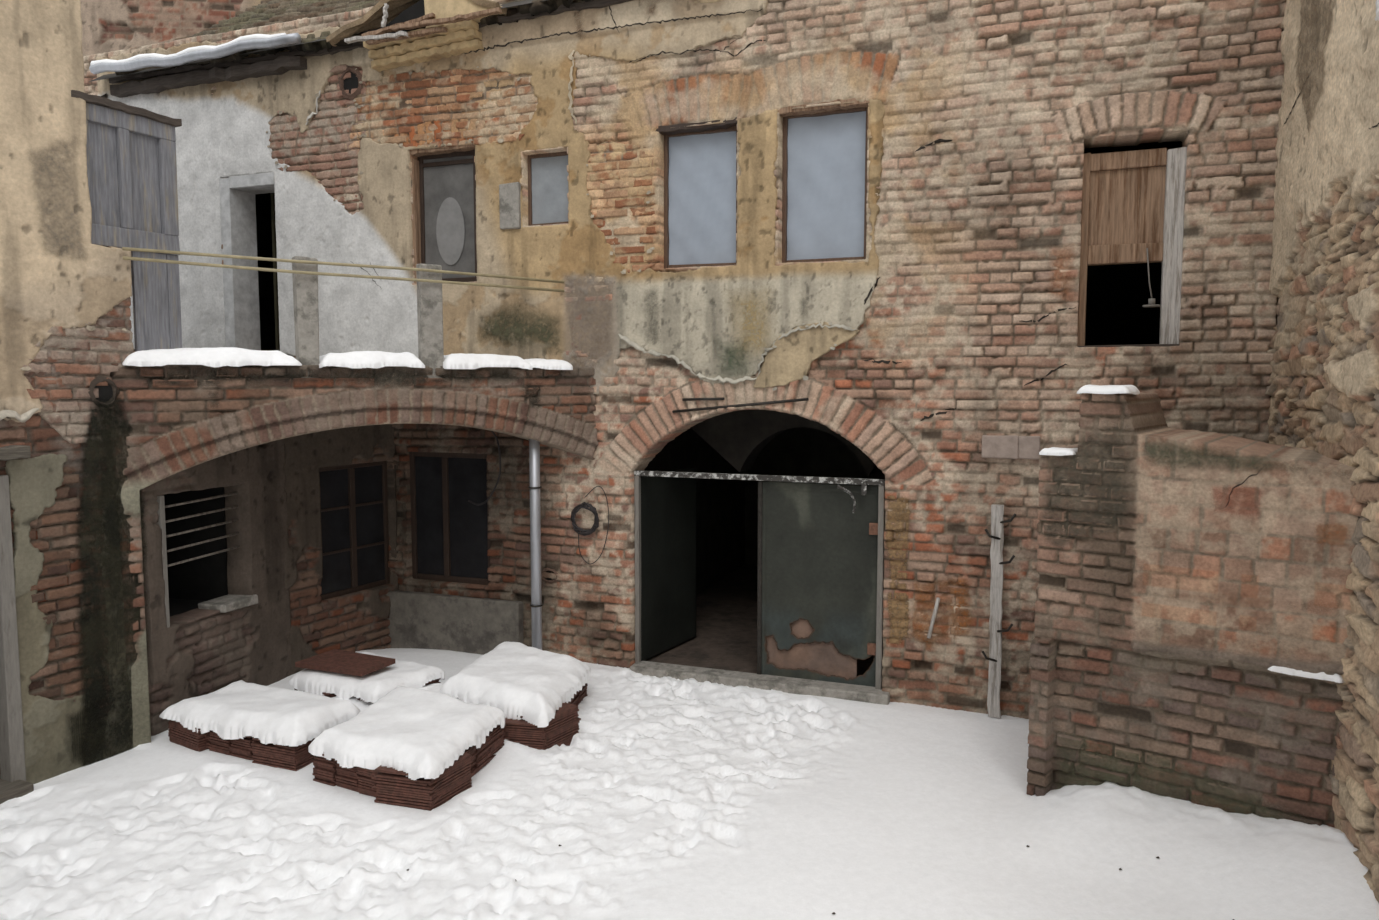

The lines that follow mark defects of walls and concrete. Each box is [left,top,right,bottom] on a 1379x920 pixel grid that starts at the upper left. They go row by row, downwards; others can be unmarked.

flaking render [266,64,538,215]
flaking render [0,322,134,447]
flaking render [618,322,860,391]
flaking render [28,467,110,702]